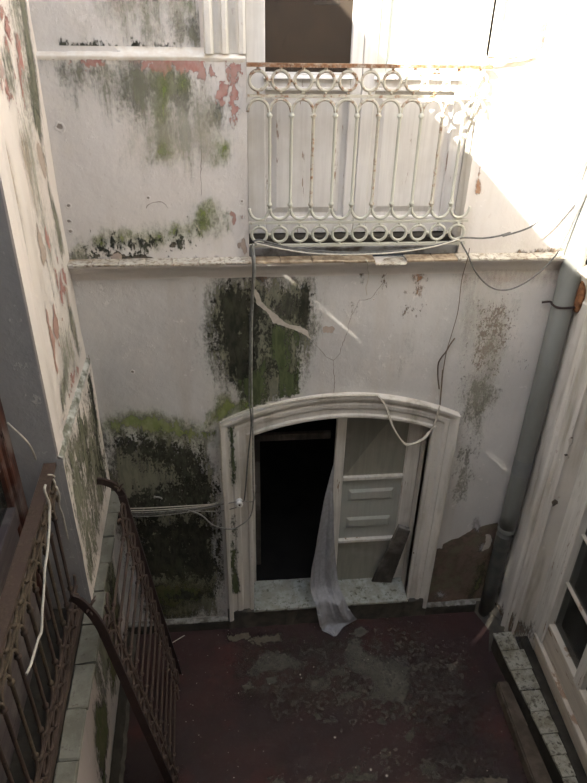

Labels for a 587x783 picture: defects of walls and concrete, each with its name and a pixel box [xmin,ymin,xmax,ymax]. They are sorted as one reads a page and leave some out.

peeling [0,6,25,115]
peeling [37,141,47,179]
peeling [81,59,106,71]
leakage [2,0,222,260]
peeling [136,60,243,128]
peeling [36,223,70,374]
leakage [204,277,319,422]
crack [254,273,387,388]
leakage [464,298,518,423]
leakage [65,370,241,625]
peeling [227,621,508,783]